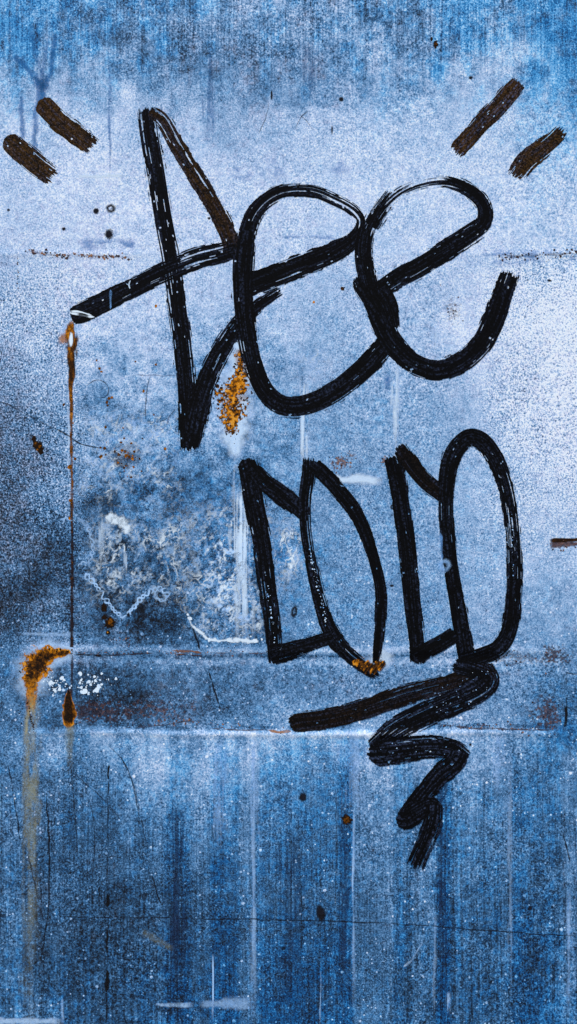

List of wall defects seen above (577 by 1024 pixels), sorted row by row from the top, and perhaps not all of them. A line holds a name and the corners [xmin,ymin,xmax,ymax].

corrosion [18,322,254,742]
water stain [61,489,265,644]
corrosion [352,649,395,674]